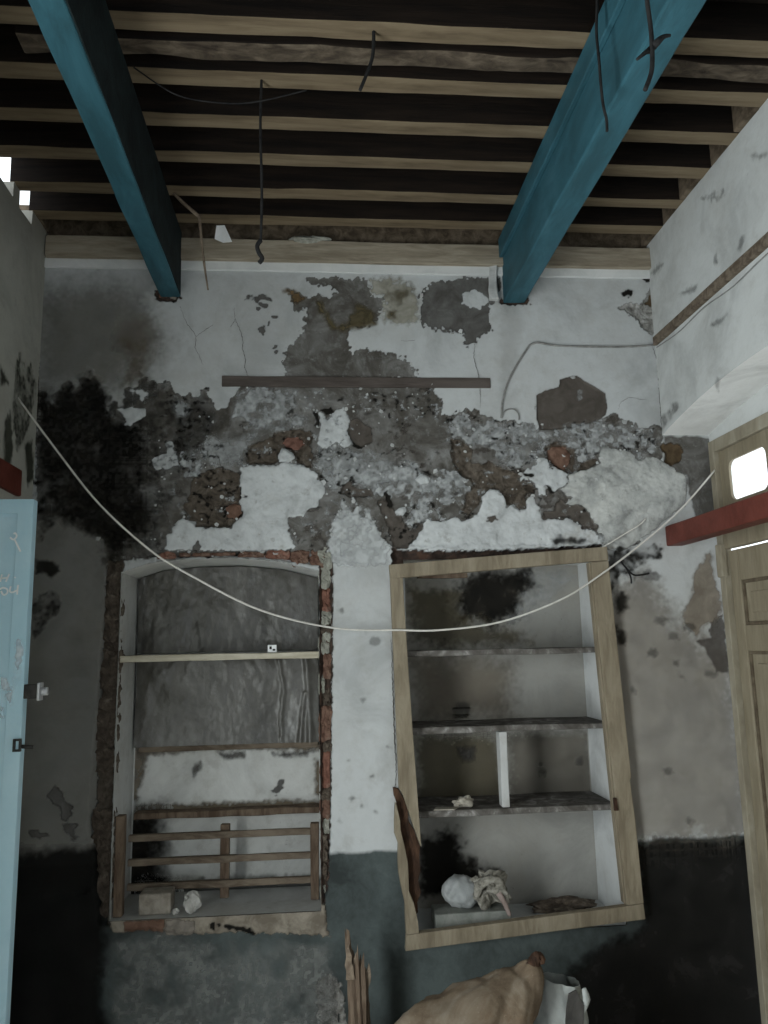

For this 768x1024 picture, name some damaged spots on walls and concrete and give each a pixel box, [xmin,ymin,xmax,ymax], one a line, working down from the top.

damp [1,292,207,1024]
flaking render [35,265,714,938]
damp [569,838,762,1024]